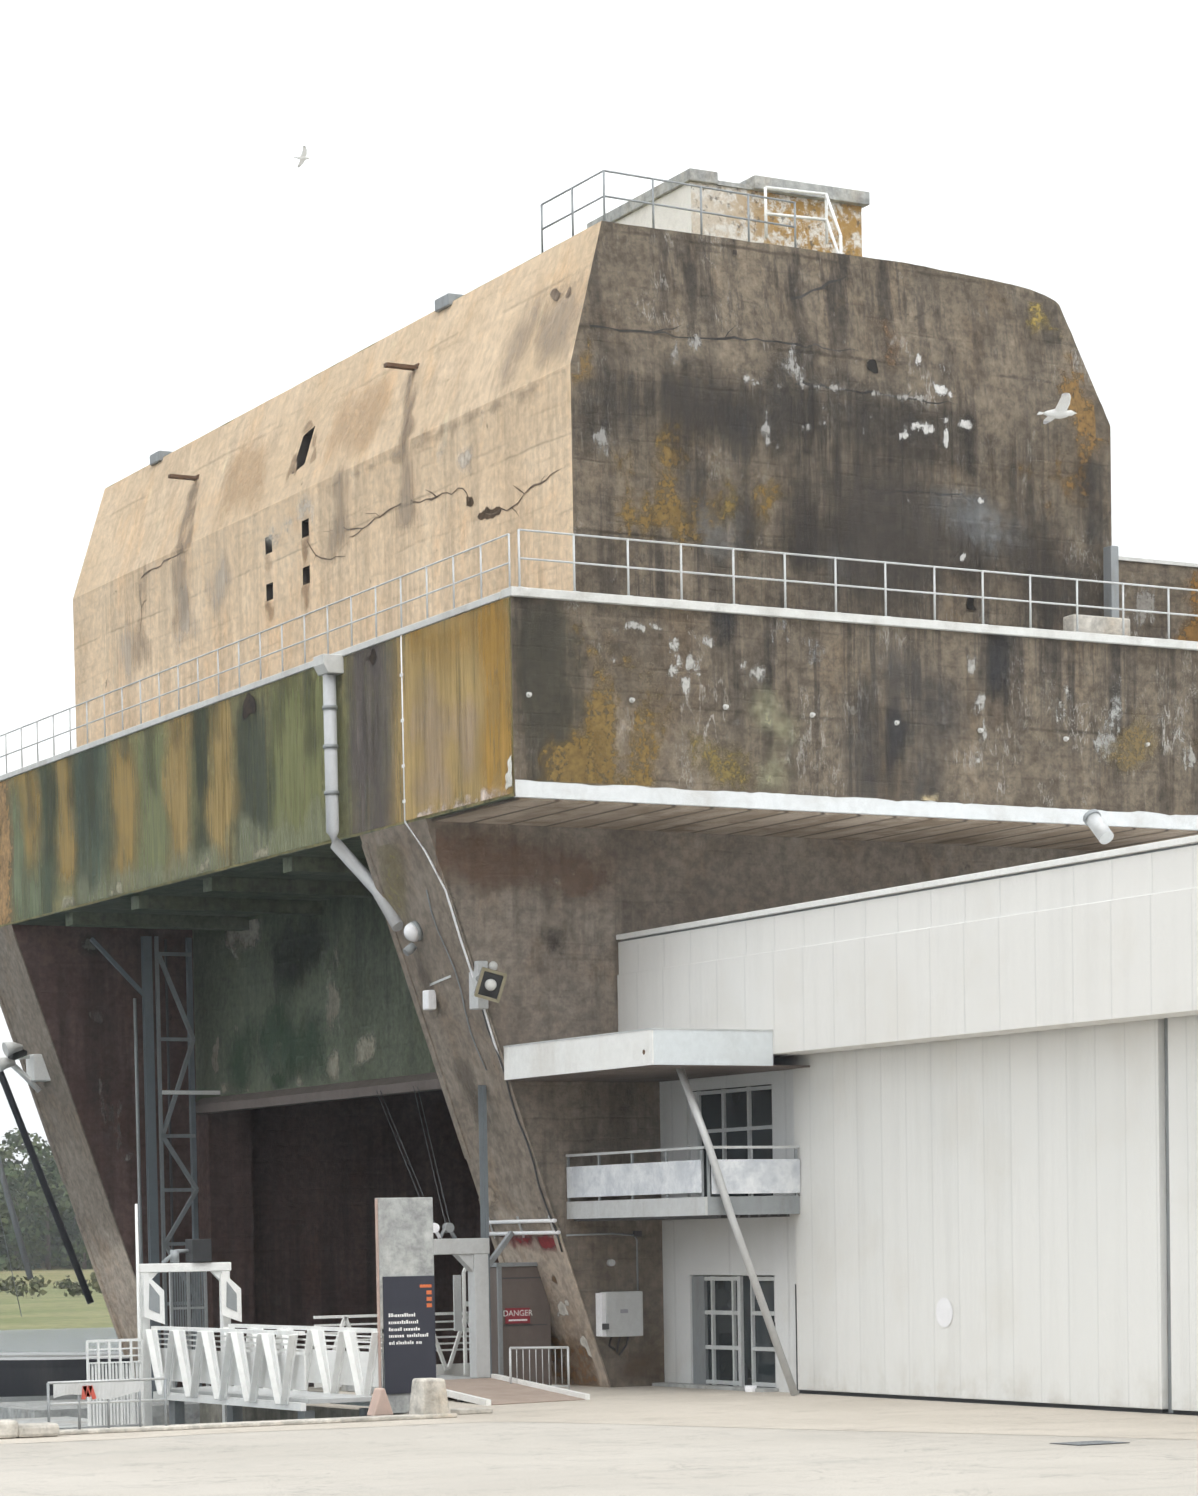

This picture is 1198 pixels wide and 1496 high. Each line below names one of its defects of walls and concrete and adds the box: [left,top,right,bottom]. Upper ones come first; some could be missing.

crack [307,468,562,565]
damp [583,335,984,604]
damp [1007,520,1082,622]
damp [1133,587,1155,626]
damp [71,744,108,905]
damp [187,707,209,873]
damp [236,710,270,864]
damp [538,613,734,786]
damp [887,656,951,763]
damp [968,635,1007,740]
damp [1093,697,1123,758]
damp [1162,718,1196,769]